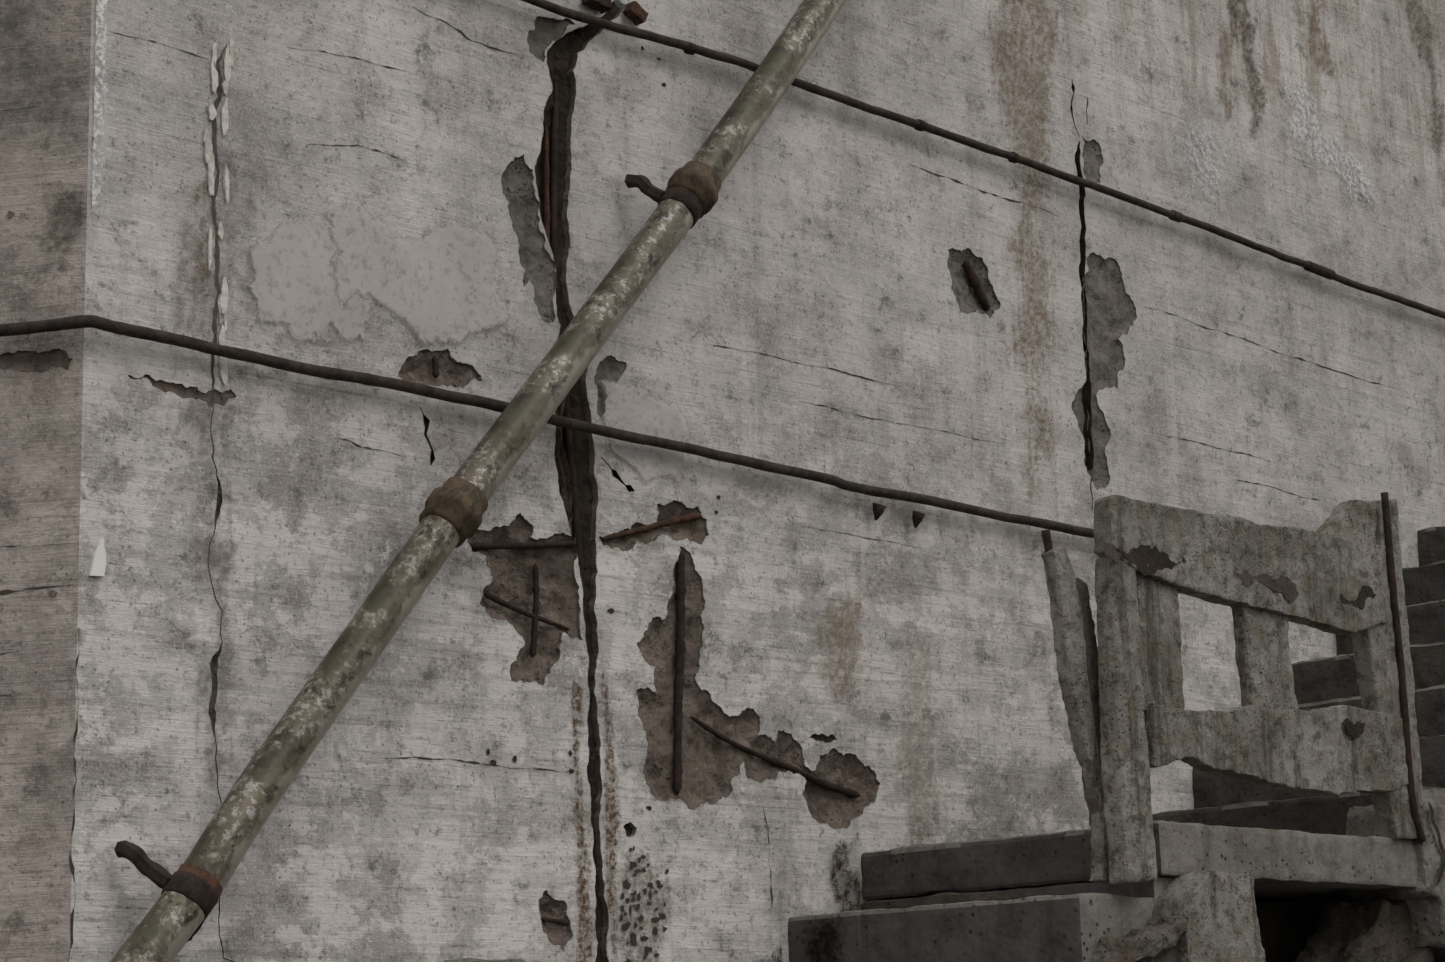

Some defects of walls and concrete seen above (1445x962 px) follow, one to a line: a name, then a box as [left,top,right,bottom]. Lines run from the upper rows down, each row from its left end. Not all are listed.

leakage [1228,0,1265,134]
leakage [1407,1,1445,146]
crack [415,0,629,340]
spalling [398,348,483,389]
spalling [947,248,1001,318]
crack [0,584,74,595]
crack [208,397,223,805]
crack [389,367,635,962]
spalling [468,513,583,685]
spalling [599,495,880,829]
crack [68,628,80,962]
spalling [539,890,573,951]